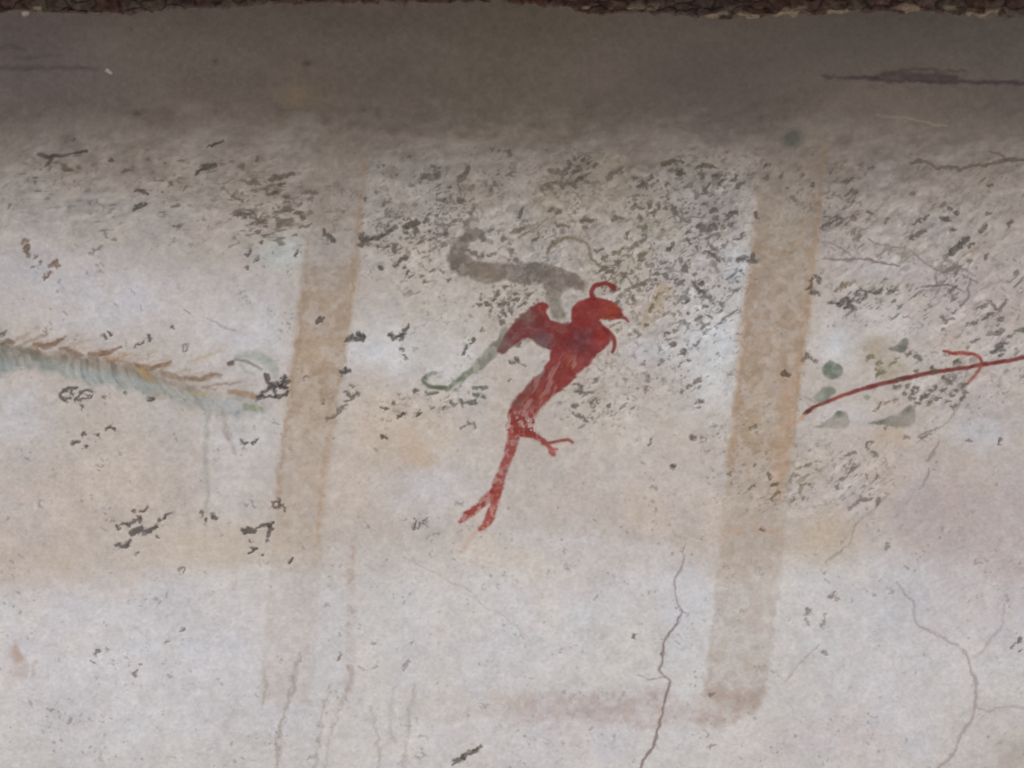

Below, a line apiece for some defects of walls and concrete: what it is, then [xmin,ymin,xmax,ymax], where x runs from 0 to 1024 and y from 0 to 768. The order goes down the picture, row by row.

flaking render [547,158,745,196]
flaking render [356,216,454,286]
flaking render [665,210,758,265]
flaking render [909,206,994,267]
flaking render [474,285,529,326]
flaking render [804,274,900,311]
flaking render [343,330,367,344]
flaking render [386,322,410,362]
flaking render [865,294,1014,414]
flaking render [411,385,490,431]
crack [637,544,687,768]
crack [895,581,1024,768]